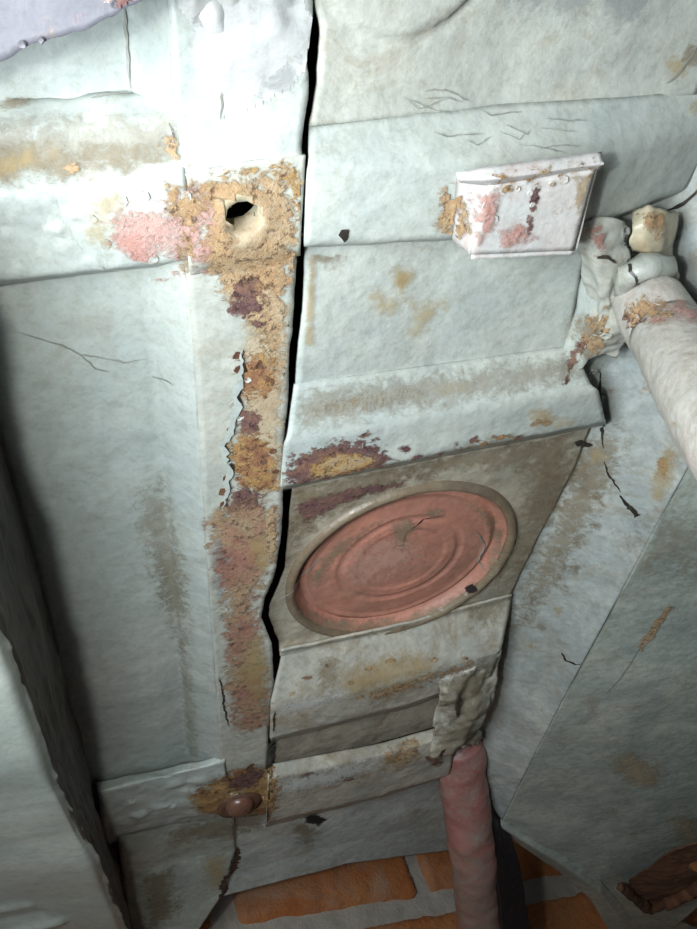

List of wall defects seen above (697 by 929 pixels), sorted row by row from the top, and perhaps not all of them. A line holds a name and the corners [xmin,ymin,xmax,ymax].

corrosion [157,123,190,166]
crack [407,89,587,152]
corrosion [433,182,477,240]
corrosion [636,212,667,240]
corrosion [189,159,308,392]
corrosion [622,294,697,330]
corrosion [563,304,613,385]
crack [596,371,604,403]
corrosion [282,429,523,487]
crack [575,425,640,518]
corrosion [185,738,443,824]
crack [219,847,241,898]